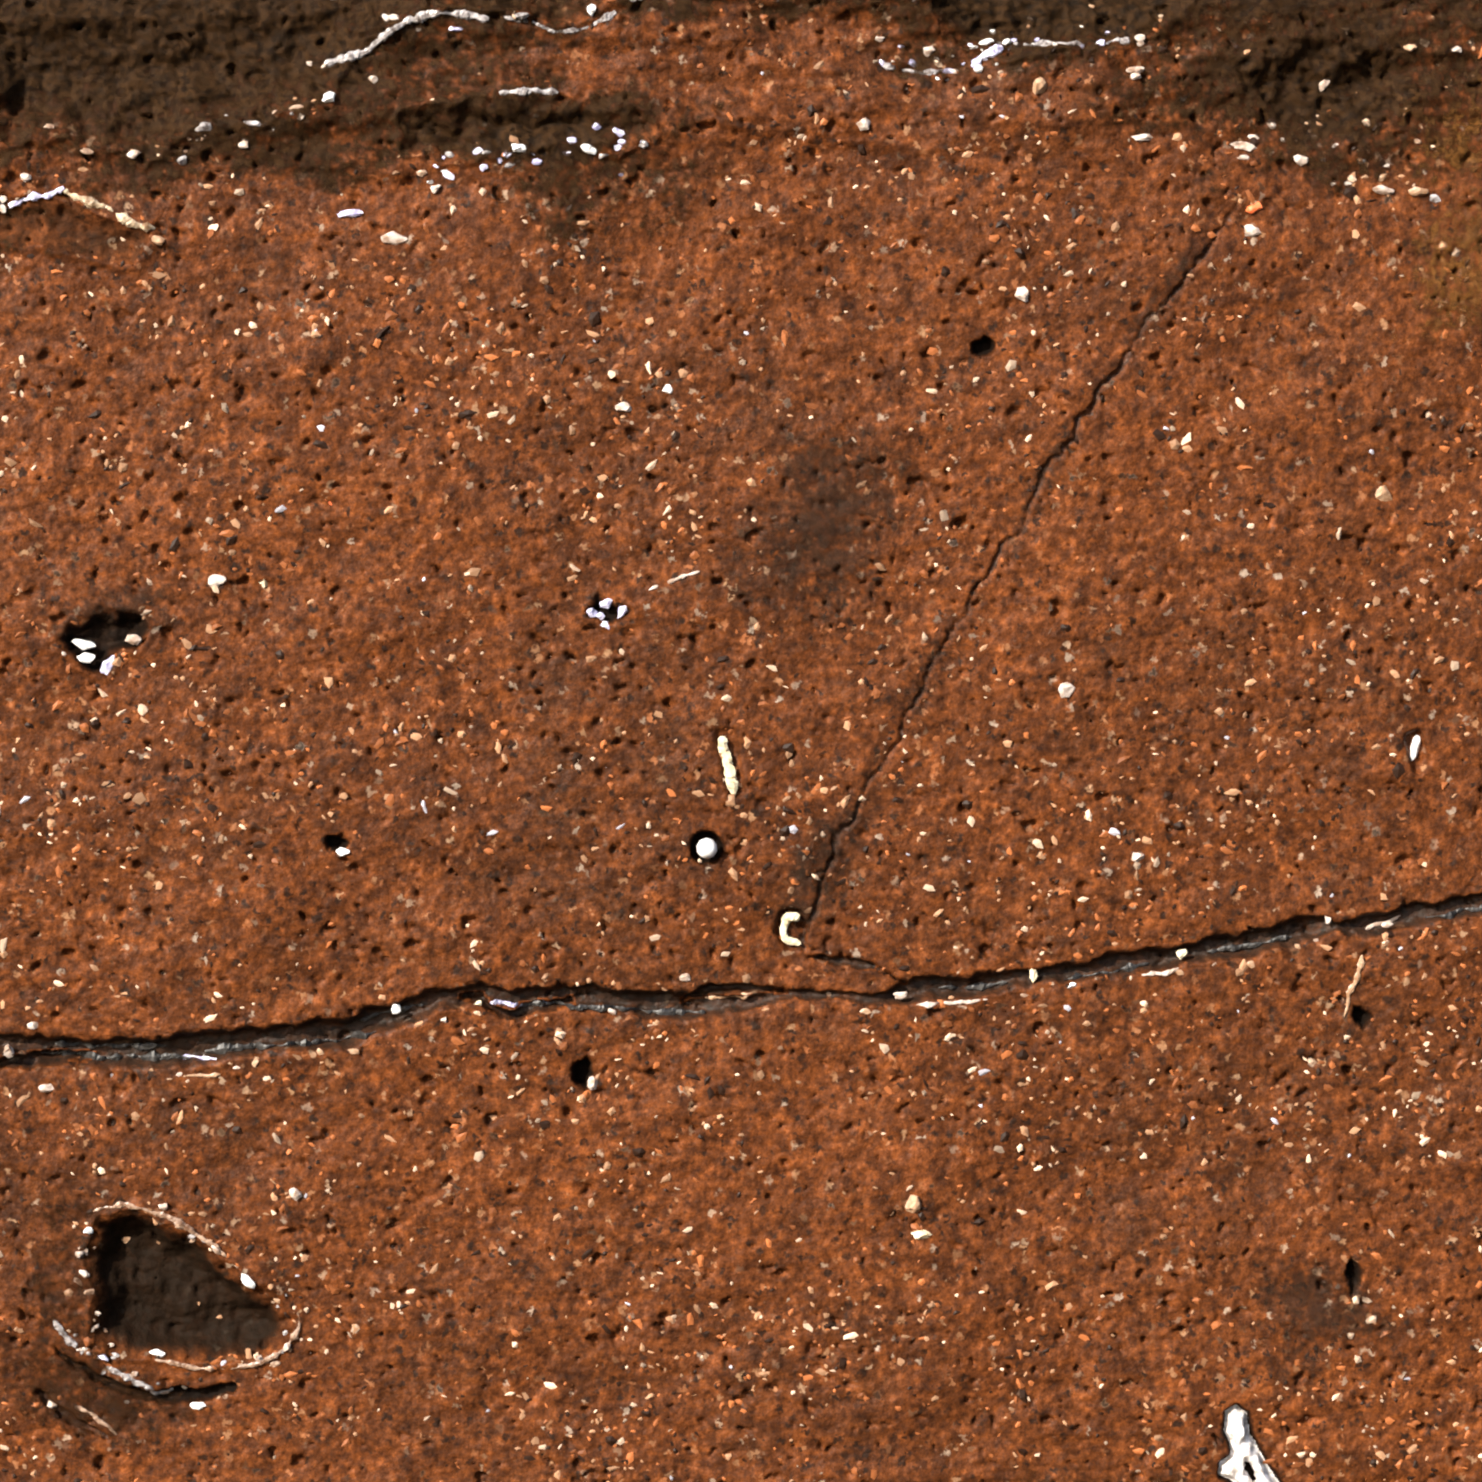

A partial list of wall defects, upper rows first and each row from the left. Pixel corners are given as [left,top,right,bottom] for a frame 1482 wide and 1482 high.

crack [0,201,1482,1092]
spalling [53,1201,301,1410]
spalling [38,1389,117,1440]